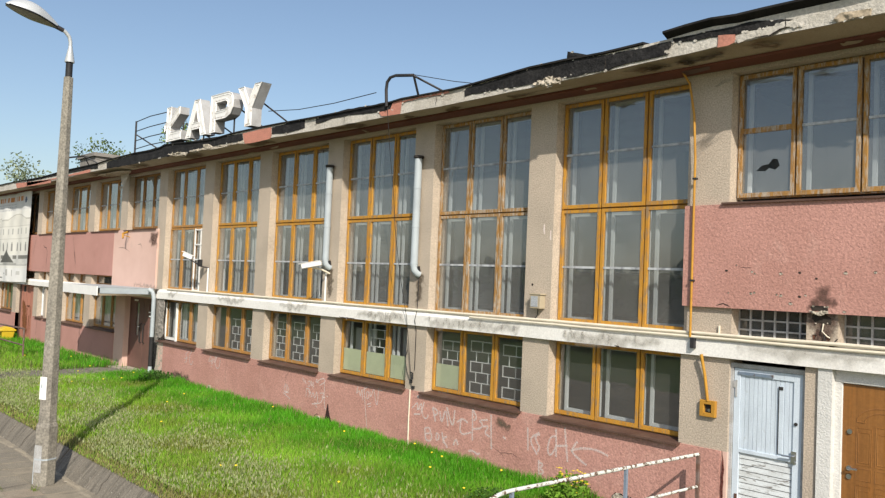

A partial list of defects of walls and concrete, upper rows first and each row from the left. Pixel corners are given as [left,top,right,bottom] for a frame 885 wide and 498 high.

peeling [831,8,872,23]
peeling [463,19,803,96]
peeling [271,91,450,134]